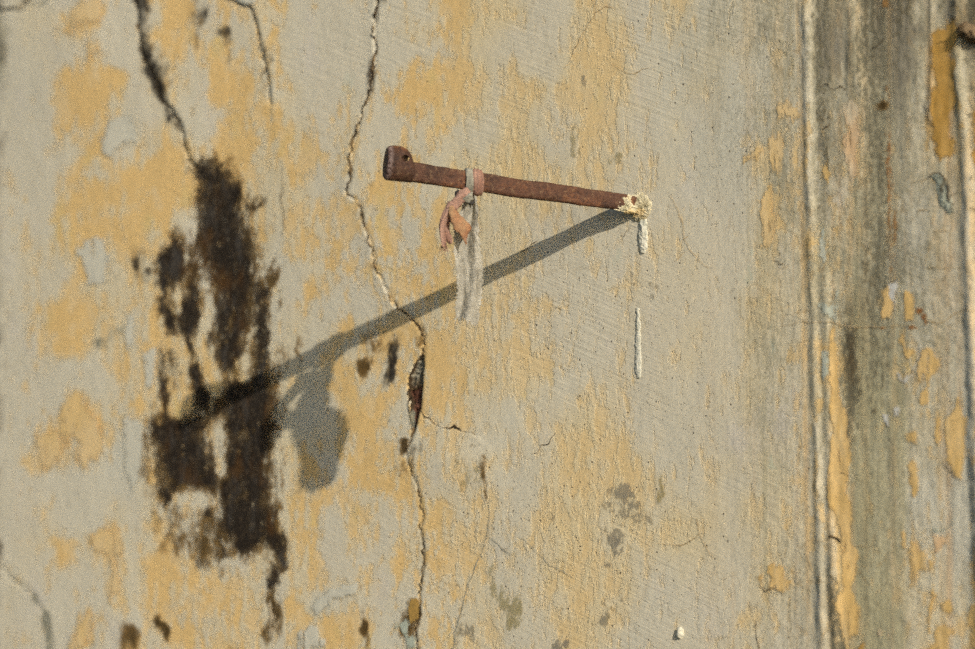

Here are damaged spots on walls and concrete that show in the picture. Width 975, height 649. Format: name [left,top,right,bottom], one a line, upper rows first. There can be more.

crack [133,0,196,167]
crack [193,8,231,41]
water stain [812,0,832,179]
peeling [929,19,958,162]
crack [345,0,426,356]
water stain [843,0,915,444]
water stain [131,151,302,644]
spalling [407,355,425,437]
peeling [881,281,940,405]
peeling [935,393,967,480]
crack [399,411,475,649]
water stain [828,575,846,649]